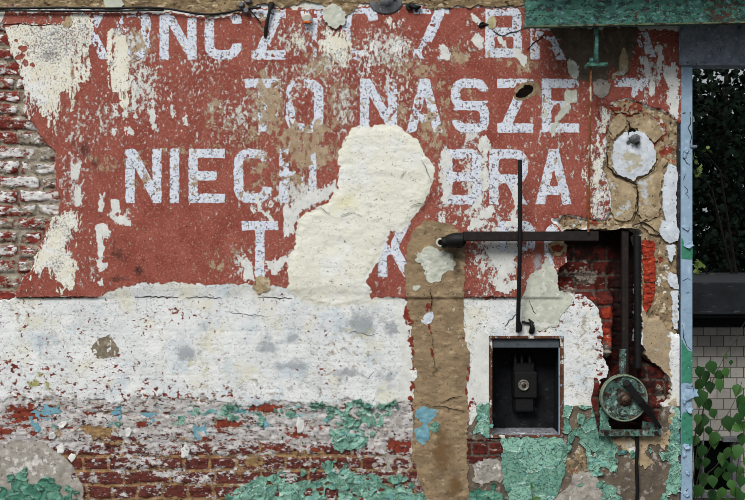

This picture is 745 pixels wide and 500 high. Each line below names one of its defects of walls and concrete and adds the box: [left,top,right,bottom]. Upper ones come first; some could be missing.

spalling [402,0,525,50]
flaking render [0,0,413,300]
spalling [541,27,699,500]
flaking render [0,298,434,500]
peeling [468,483,511,500]